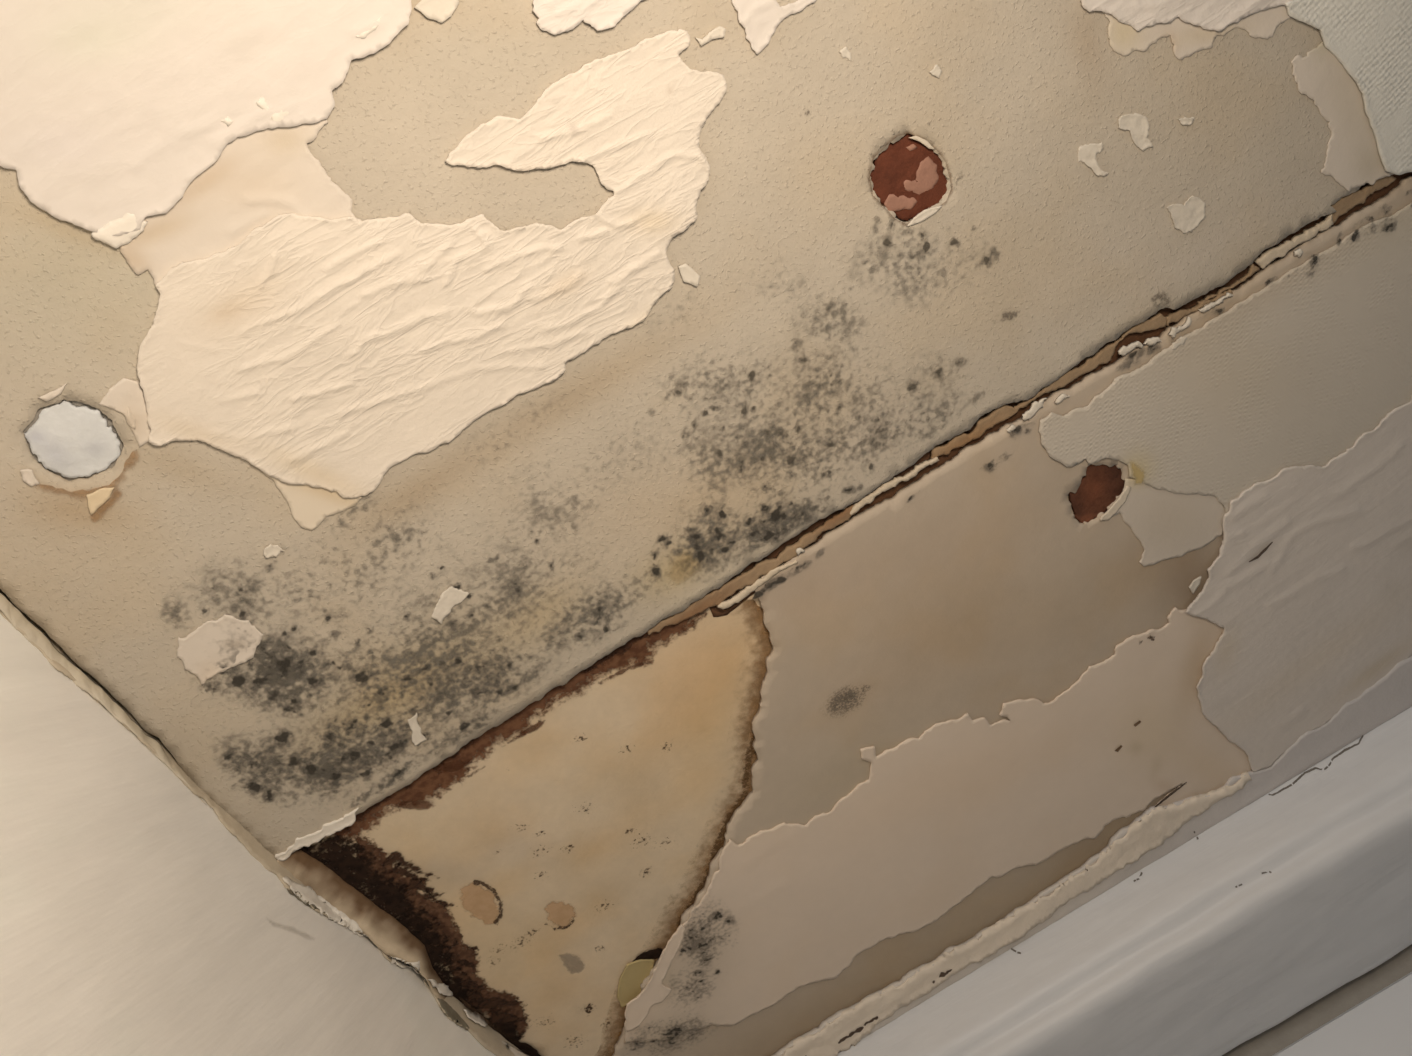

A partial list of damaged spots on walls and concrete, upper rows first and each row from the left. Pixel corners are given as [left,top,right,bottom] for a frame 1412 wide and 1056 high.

peeling [1081,0,1293,60]
peeling [1118,113,1153,151]
peeling [1291,41,1393,192]
peeling [0,0,816,531]
damp [701,405,898,481]
crack [647,172,1412,635]
damp [652,500,818,575]
damp [202,567,707,1056]
damp [632,562,806,998]
peeling [617,395,1412,1044]
crack [1155,782,1187,807]
crack [1269,735,1363,796]